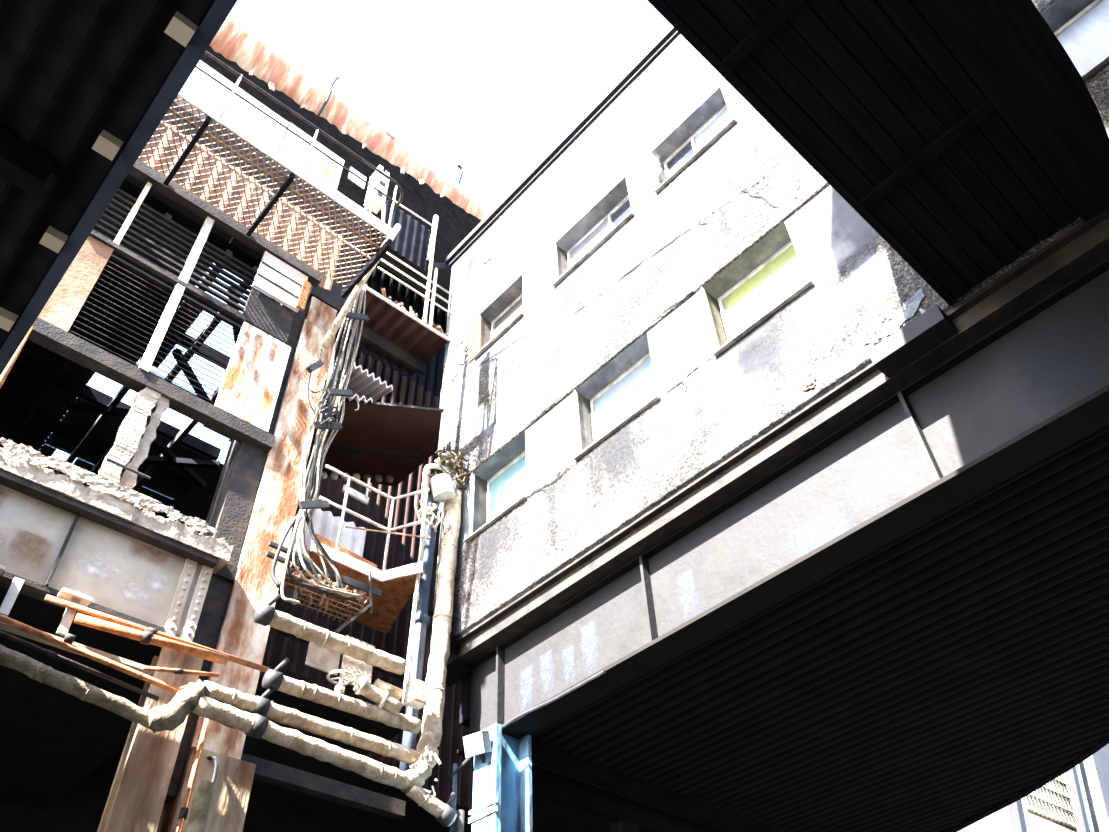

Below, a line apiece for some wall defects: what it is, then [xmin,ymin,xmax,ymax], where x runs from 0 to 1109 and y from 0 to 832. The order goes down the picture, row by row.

spalling [861,289,925,349]
corrosion [232,333,278,405]
spalling [0,437,225,540]
corrosion [273,400,307,513]
corrosion [256,531,280,581]
corrosion [224,600,245,652]